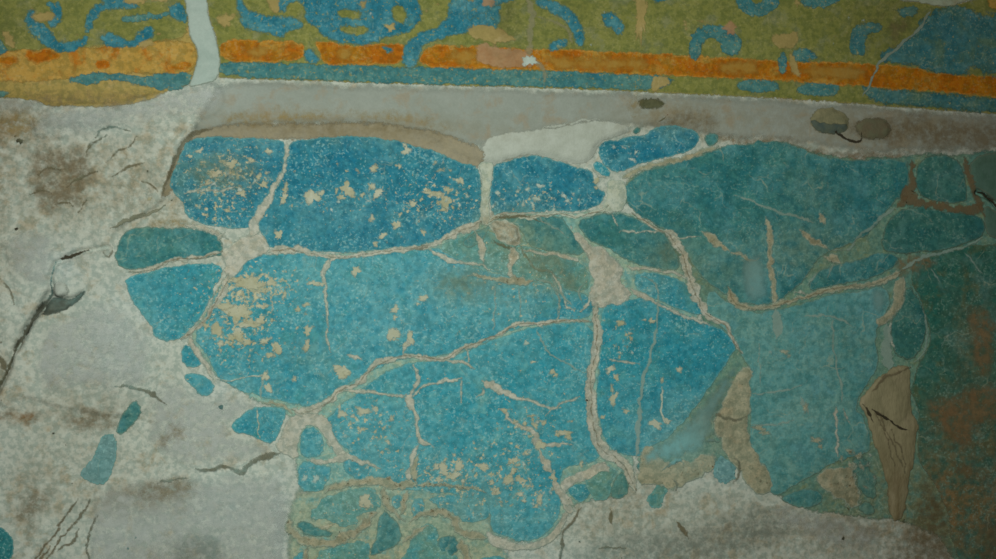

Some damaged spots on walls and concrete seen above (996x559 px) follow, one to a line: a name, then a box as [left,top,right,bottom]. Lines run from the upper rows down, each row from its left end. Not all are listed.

crack [863,11,931,95]
spalling [162,121,484,256]
spalling [42,282,85,315]
peeling [192,275,287,378]
peeling [235,184,748,559]
crack [0,129,996,559]
peeling [745,142,996,559]